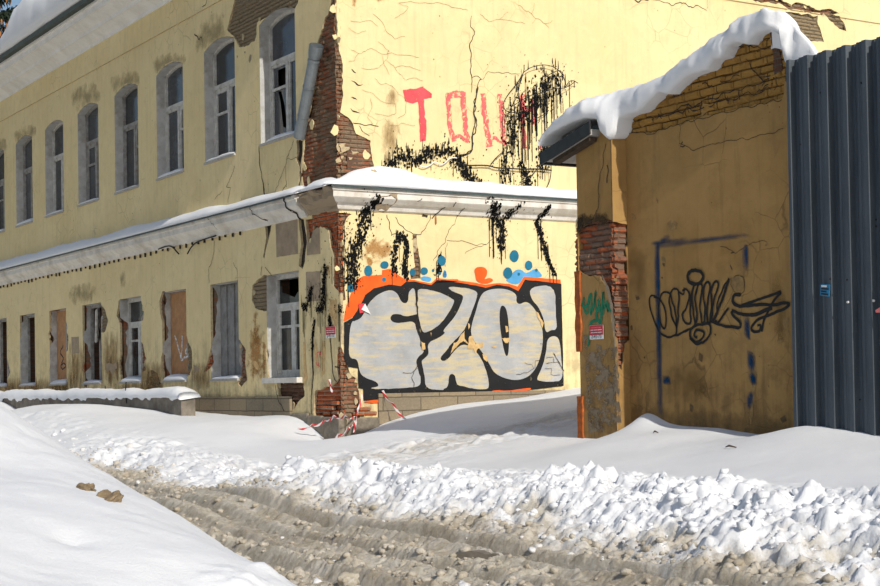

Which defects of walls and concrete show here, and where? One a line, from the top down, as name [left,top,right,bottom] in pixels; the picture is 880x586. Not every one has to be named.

flaking render [228,0,298,63]
flaking render [301,0,373,191]
crack [349,1,552,157]
crack [629,44,783,151]
flaking render [632,32,786,133]
crack [387,199,493,261]
leakage [250,314,265,376]
flaking render [252,275,270,311]
spalling [278,340,325,409]
spalling [316,347,377,425]
flaking render [574,220,639,433]